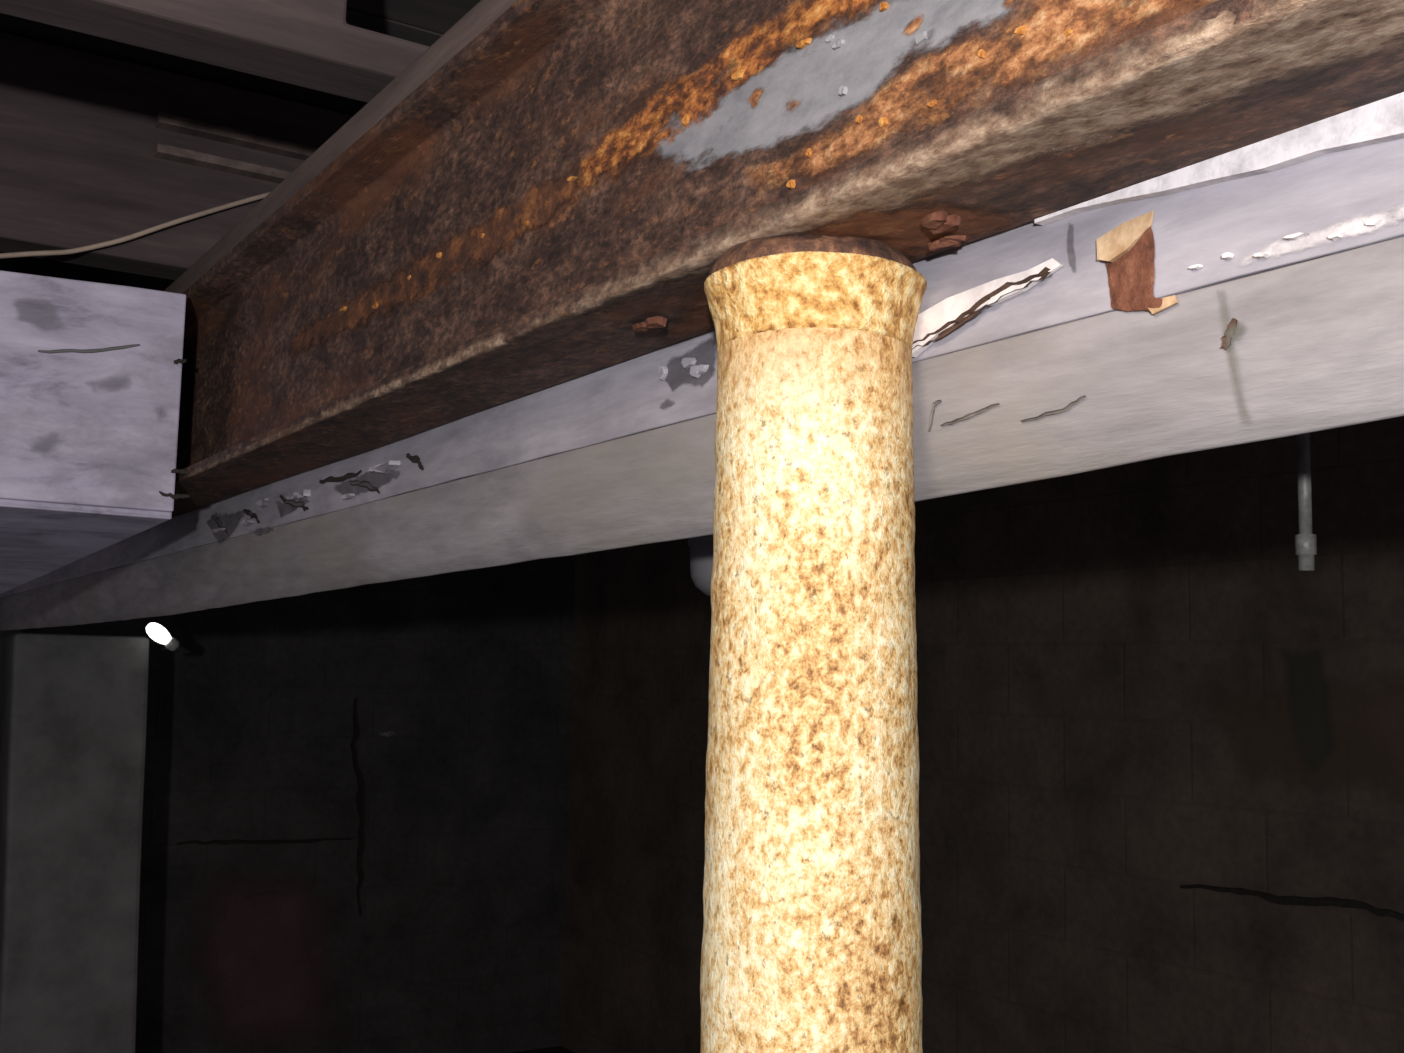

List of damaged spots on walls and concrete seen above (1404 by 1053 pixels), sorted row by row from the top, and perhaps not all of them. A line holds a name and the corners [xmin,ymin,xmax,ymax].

peeling [656,0,1018,169]
rust [289,0,889,358]
rust [579,0,1404,311]
peeling [912,225,1076,358]
peeling [1096,211,1178,315]
rust [234,334,505,457]
peeling [658,339,715,409]
peeling [207,453,424,543]
crack [1180,884,1404,921]